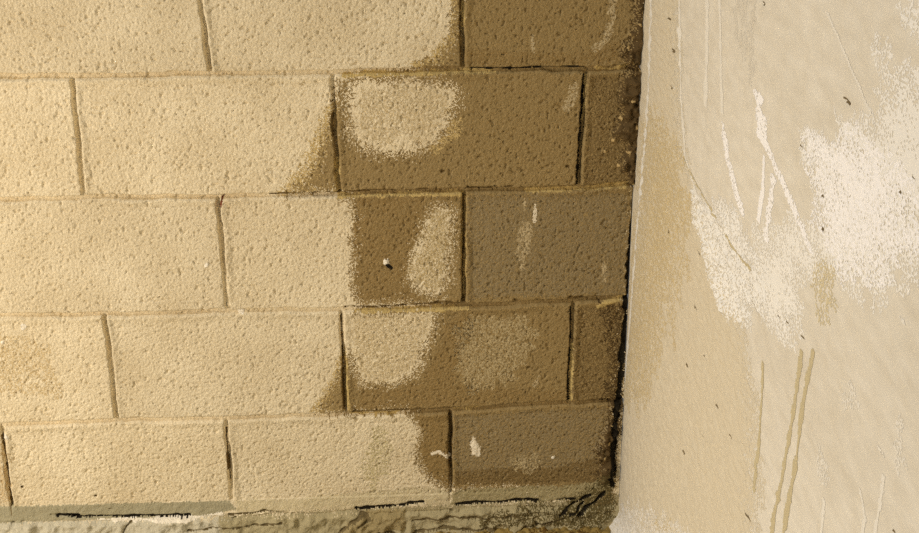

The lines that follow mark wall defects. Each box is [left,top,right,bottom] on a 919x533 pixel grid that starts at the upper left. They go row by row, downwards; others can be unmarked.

crack [339,185,632,533]
damp [276,0,700,533]
damp [810,258,838,326]